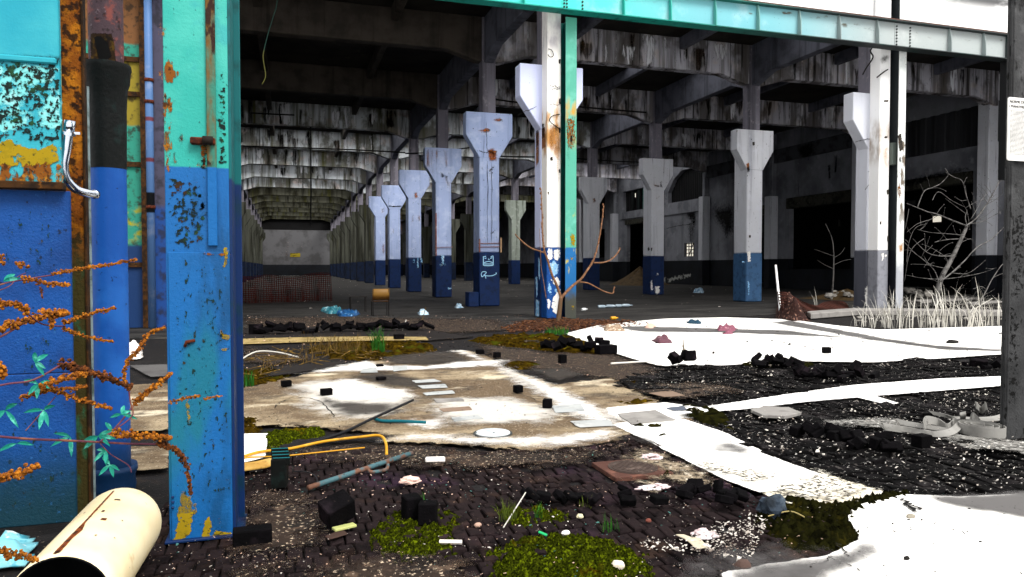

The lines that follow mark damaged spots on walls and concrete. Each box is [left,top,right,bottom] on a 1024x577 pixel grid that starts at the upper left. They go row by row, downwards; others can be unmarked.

peeling [0,56,64,146]
corrosion [159,60,183,172]
leakage [577,39,592,59]
leakage [583,91,627,110]
leakage [623,35,666,66]
leakage [680,43,727,71]
leakage [950,69,977,92]
corrosion [536,118,576,165]
peeling [535,235,575,317]
peeling [168,179,232,502]